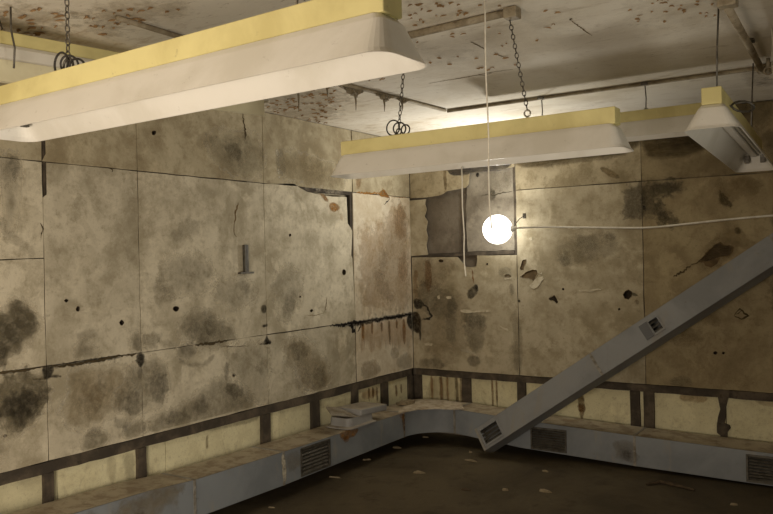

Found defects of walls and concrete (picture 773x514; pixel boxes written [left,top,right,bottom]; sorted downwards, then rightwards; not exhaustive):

spalling [519,259,544,289]
leakage [0,300,56,431]